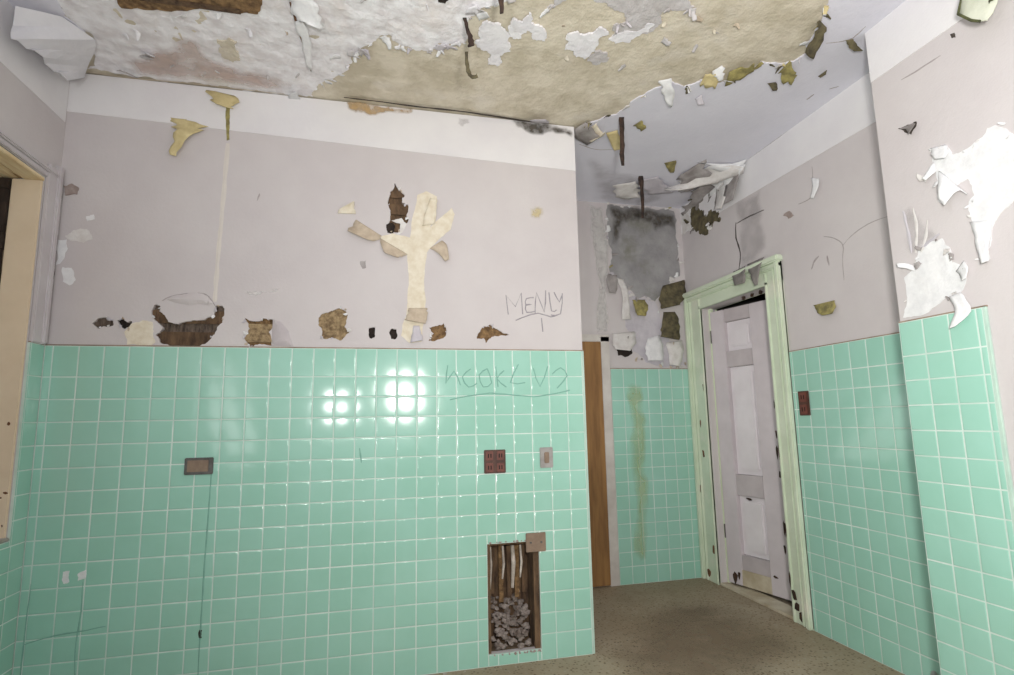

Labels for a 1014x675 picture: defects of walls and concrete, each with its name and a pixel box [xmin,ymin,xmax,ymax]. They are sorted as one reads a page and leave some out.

peeling [846,39,863,51]
flaking render [11,0,831,166]
peeling [896,121,1014,329]
peeling [338,186,455,343]
leakage [593,209,672,329]
flaking render [605,159,747,369]
peeling [732,257,764,300]
flaking render [94,305,224,346]
flaking render [241,319,273,348]
flaking render [318,306,352,341]
flaking render [477,324,507,342]
peeling [813,300,836,315]